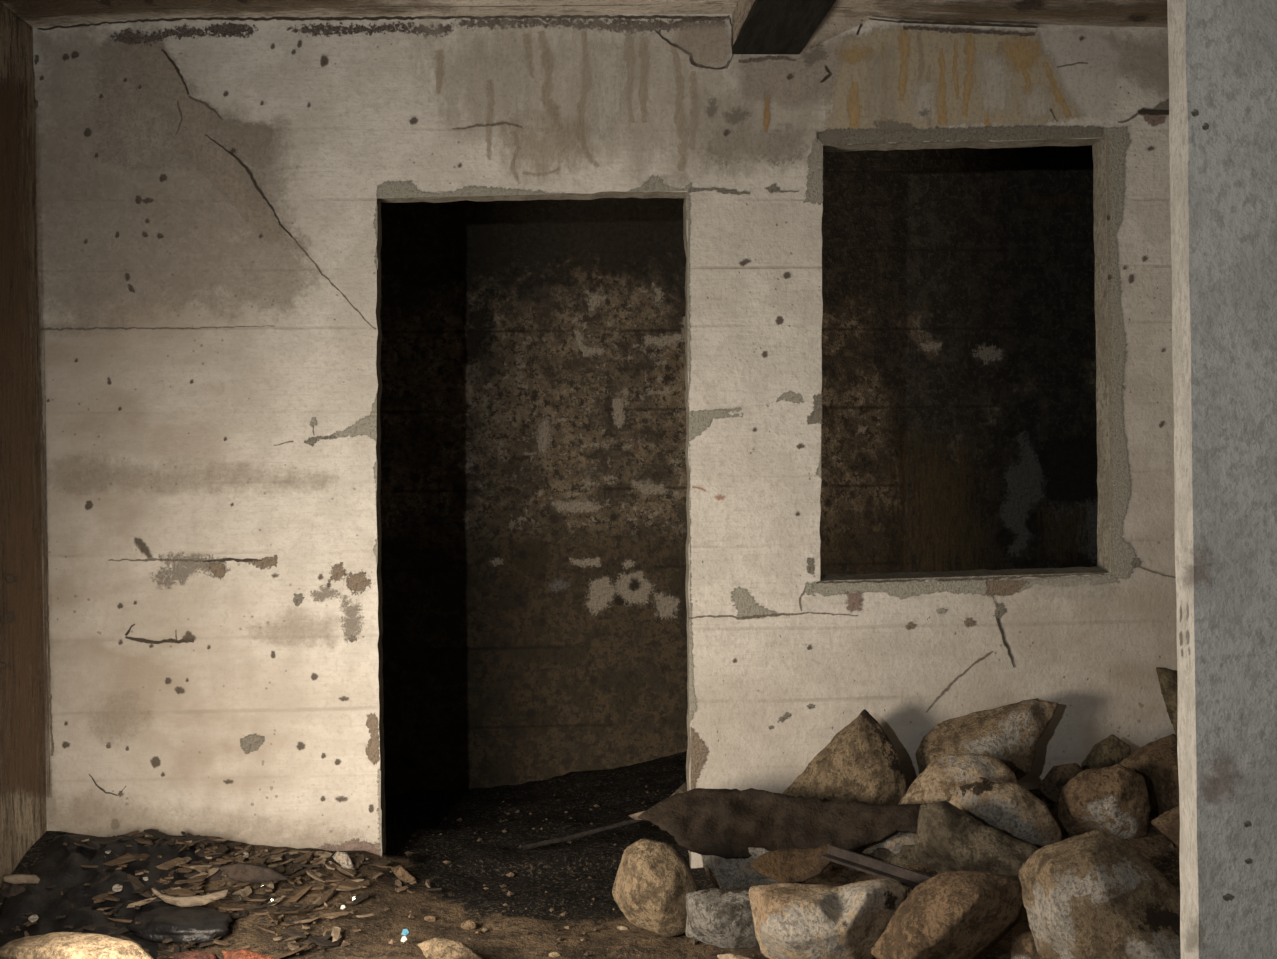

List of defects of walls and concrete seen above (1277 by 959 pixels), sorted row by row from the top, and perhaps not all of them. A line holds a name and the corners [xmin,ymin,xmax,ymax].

spalling [869,18,1037,28]
peeling [37,15,727,238]
damp [452,31,648,179]
rust [825,25,1086,131]
crack [175,100,376,330]
spalling [373,180,565,270]
spalling [628,174,737,387]
spalling [274,394,377,447]
spalling [688,120,1176,790]
spalling [108,538,278,589]
spalling [293,562,371,643]